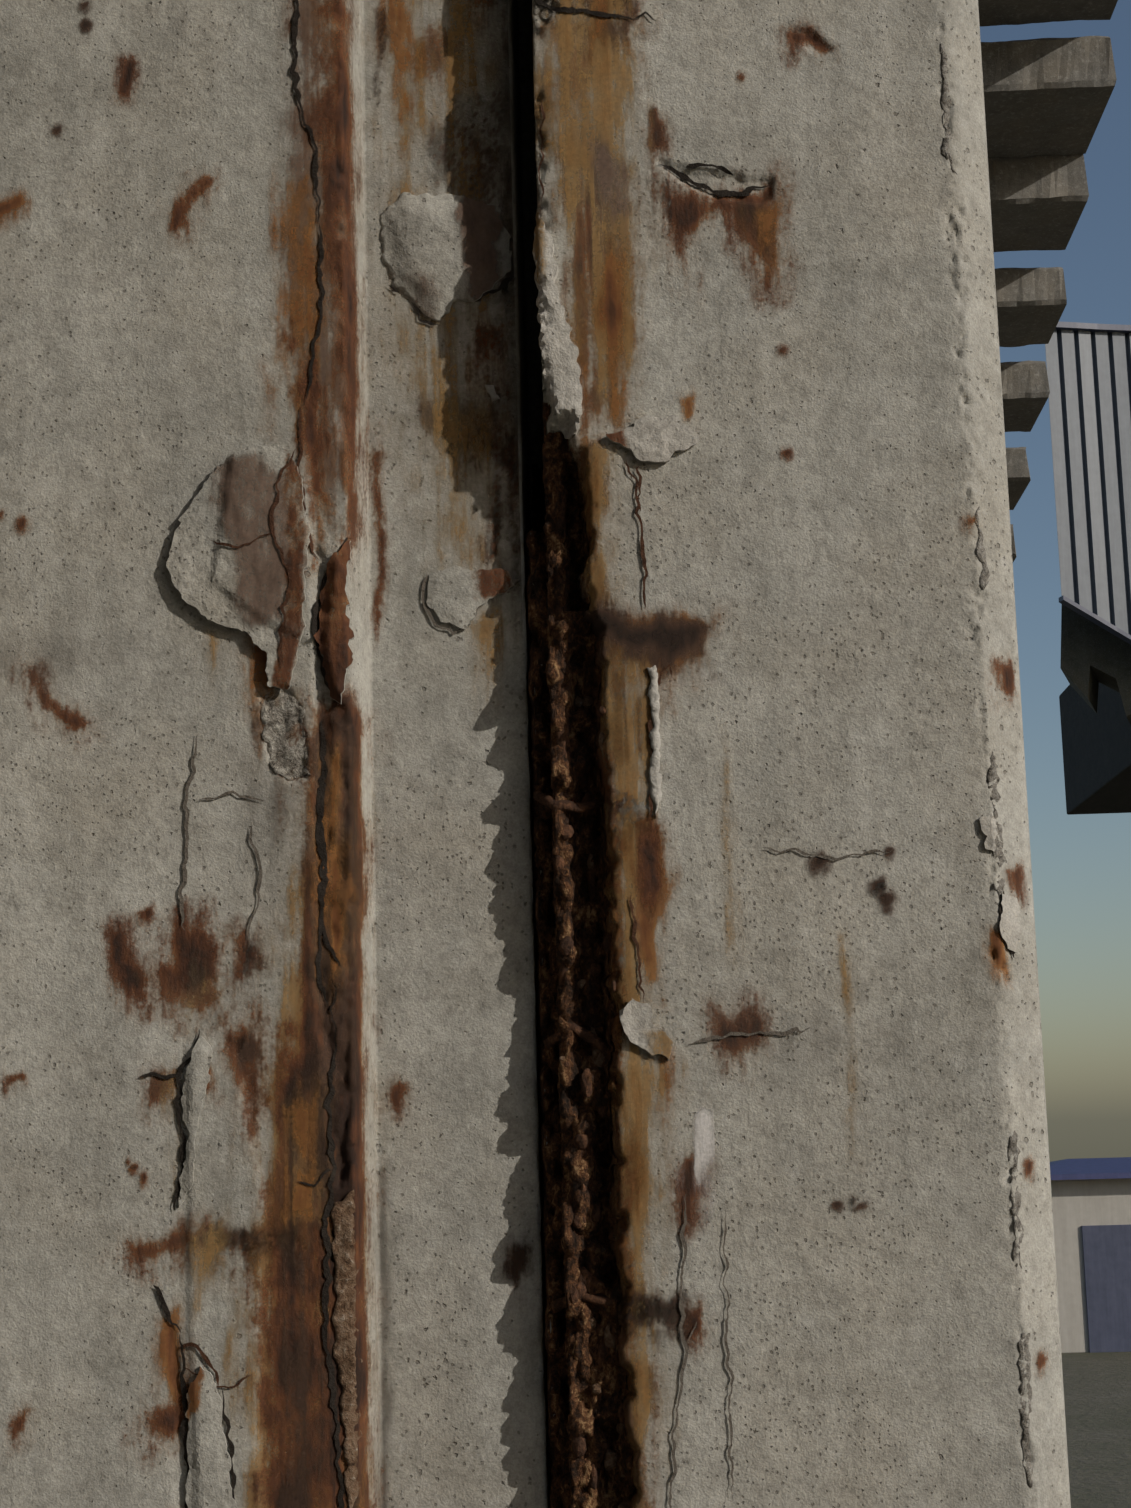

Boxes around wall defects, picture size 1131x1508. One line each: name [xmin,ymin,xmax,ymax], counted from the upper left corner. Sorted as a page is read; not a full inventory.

crack [535,0,656,21]
corrosion [271,0,388,636]
crack [659,163,770,197]
corrosion [647,106,792,309]
crack [178,737,267,939]
peeling [166,444,355,781]
corrosion [249,639,273,755]
crack [211,0,352,1508]
spalling [426,209,673,1508]
corrosion [535,0,720,1508]
corrosion [104,689,379,1508]
crack [153,1285,251,1508]